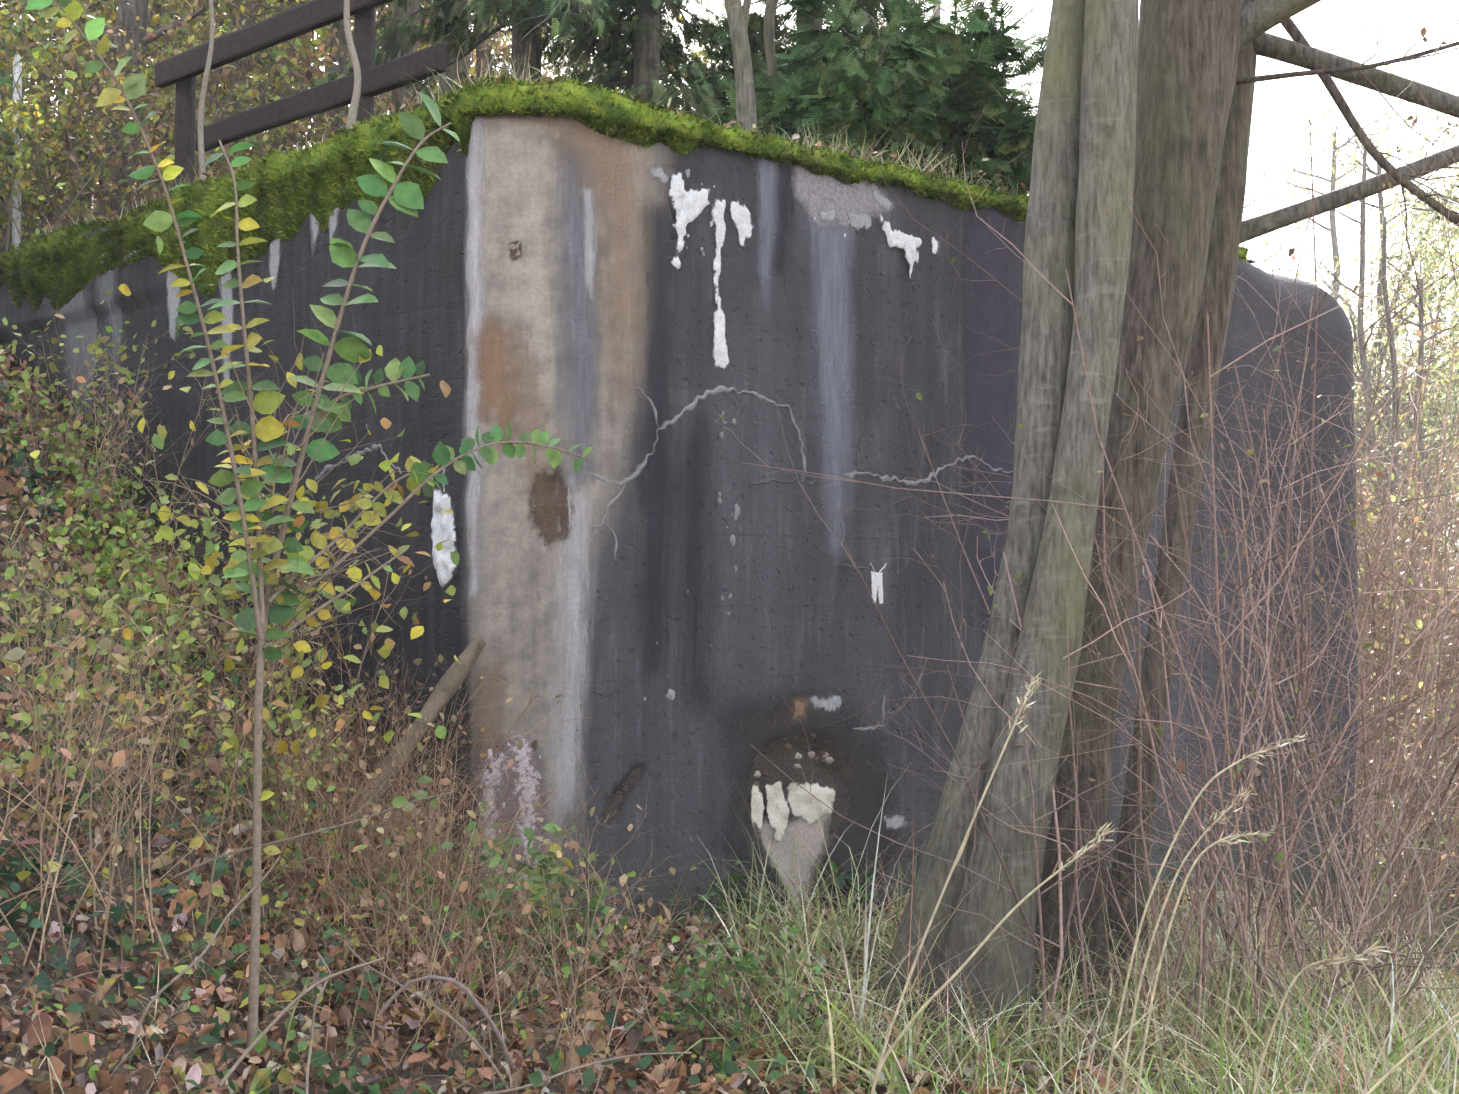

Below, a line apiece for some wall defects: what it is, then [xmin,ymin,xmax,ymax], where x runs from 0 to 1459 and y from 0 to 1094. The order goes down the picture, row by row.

leakage [431,115,939,923]
crack [582,384,807,560]
crack [842,455,1013,486]
spalling [746,695,885,910]